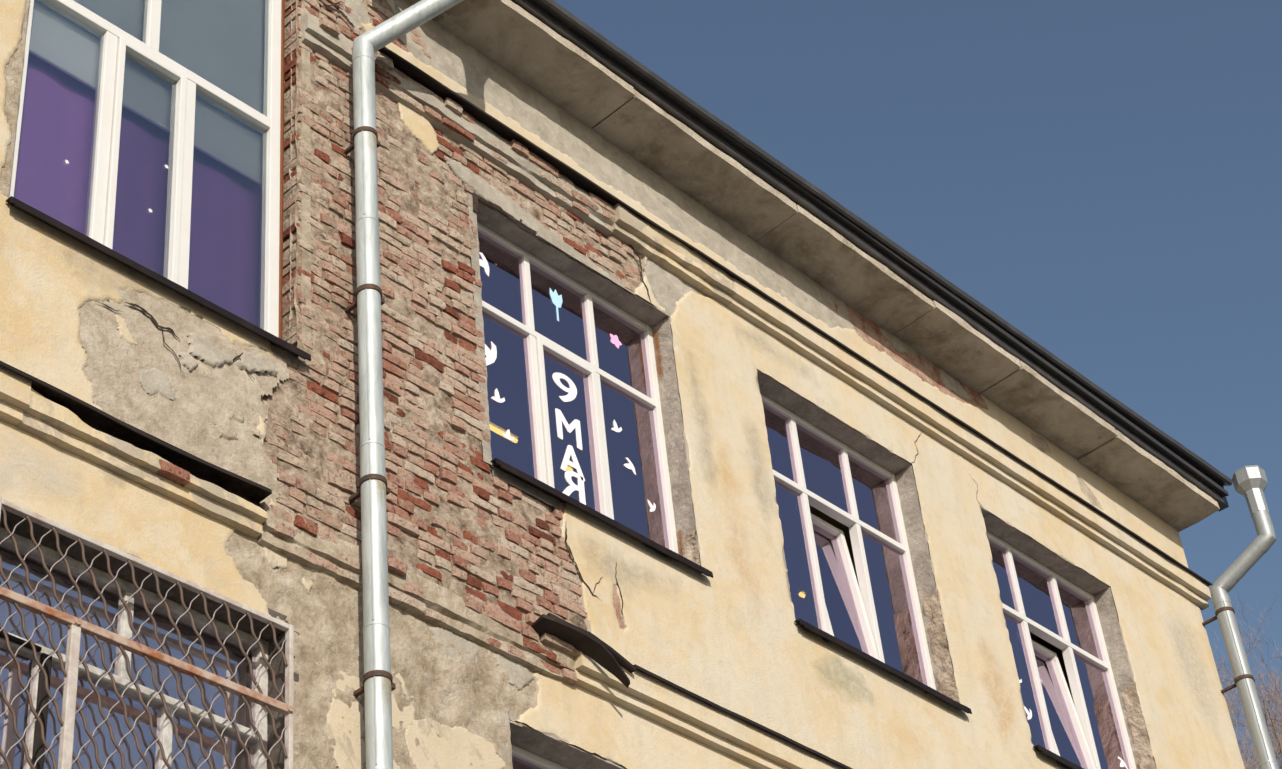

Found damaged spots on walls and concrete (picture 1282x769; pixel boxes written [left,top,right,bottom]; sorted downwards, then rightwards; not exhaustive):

flaking render [392,19,987,410]
crack [97,301,184,374]
flaking render [16,0,412,769]
flaking render [375,88,708,630]
flaking render [389,603,541,769]
crack [565,528,624,617]
flaking render [923,590,960,703]